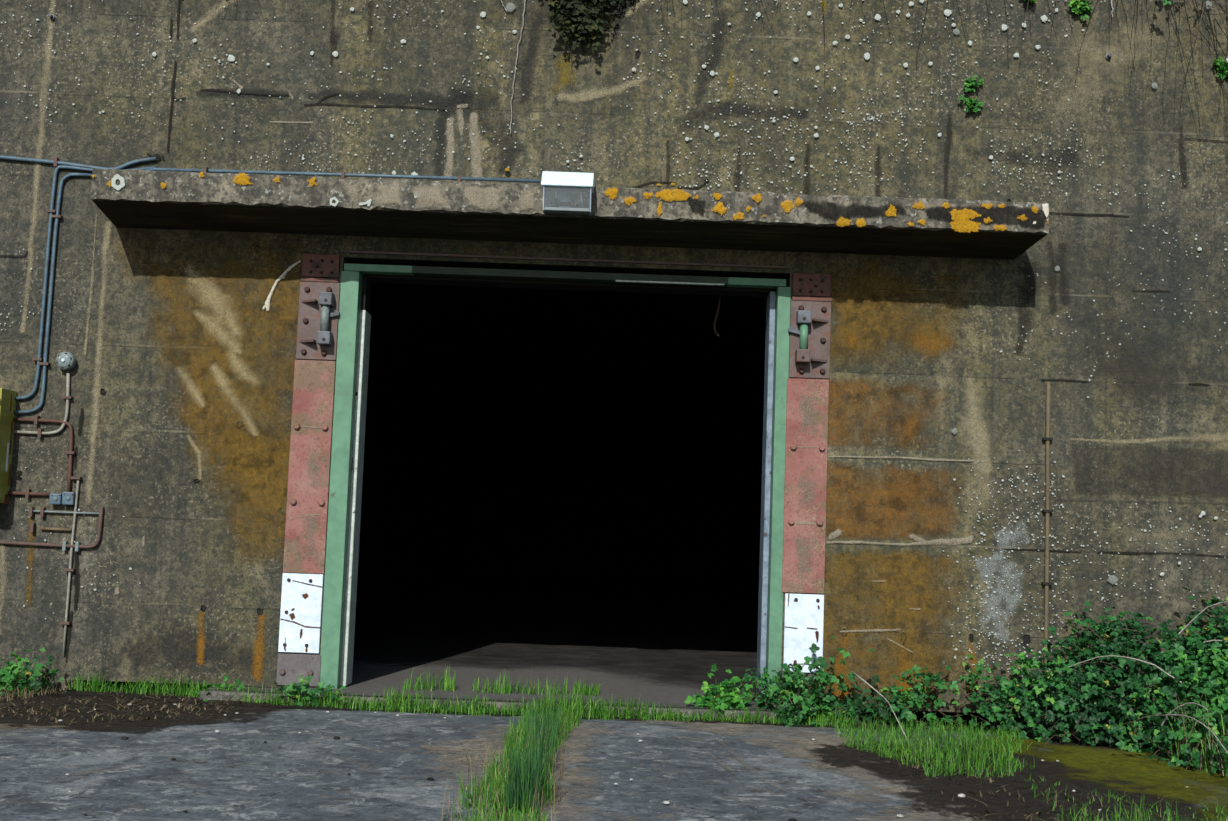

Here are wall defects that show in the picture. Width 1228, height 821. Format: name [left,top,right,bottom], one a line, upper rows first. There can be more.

water stain [197,89,287,98]
water stain [310,88,517,176]
water stain [687,13,807,122]
rust [828,381,924,446]
rust [826,462,958,538]
rust [810,552,977,705]
water stain [974,529,1029,640]